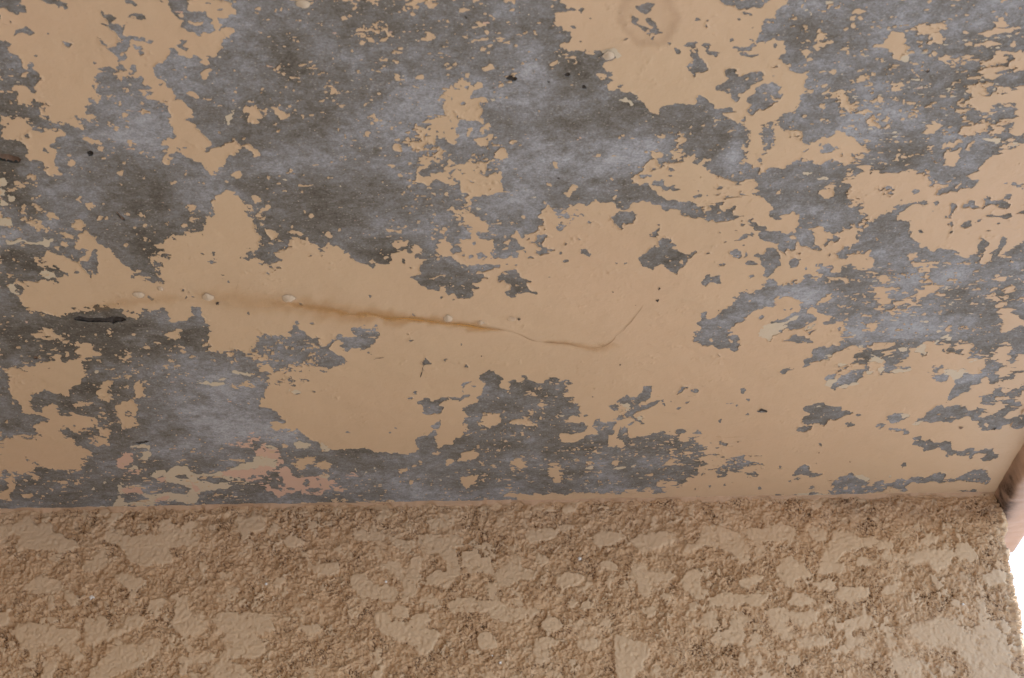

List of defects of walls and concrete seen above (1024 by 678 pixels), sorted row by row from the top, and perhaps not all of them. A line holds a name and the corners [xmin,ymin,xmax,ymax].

peeling [0,0,1024,509]